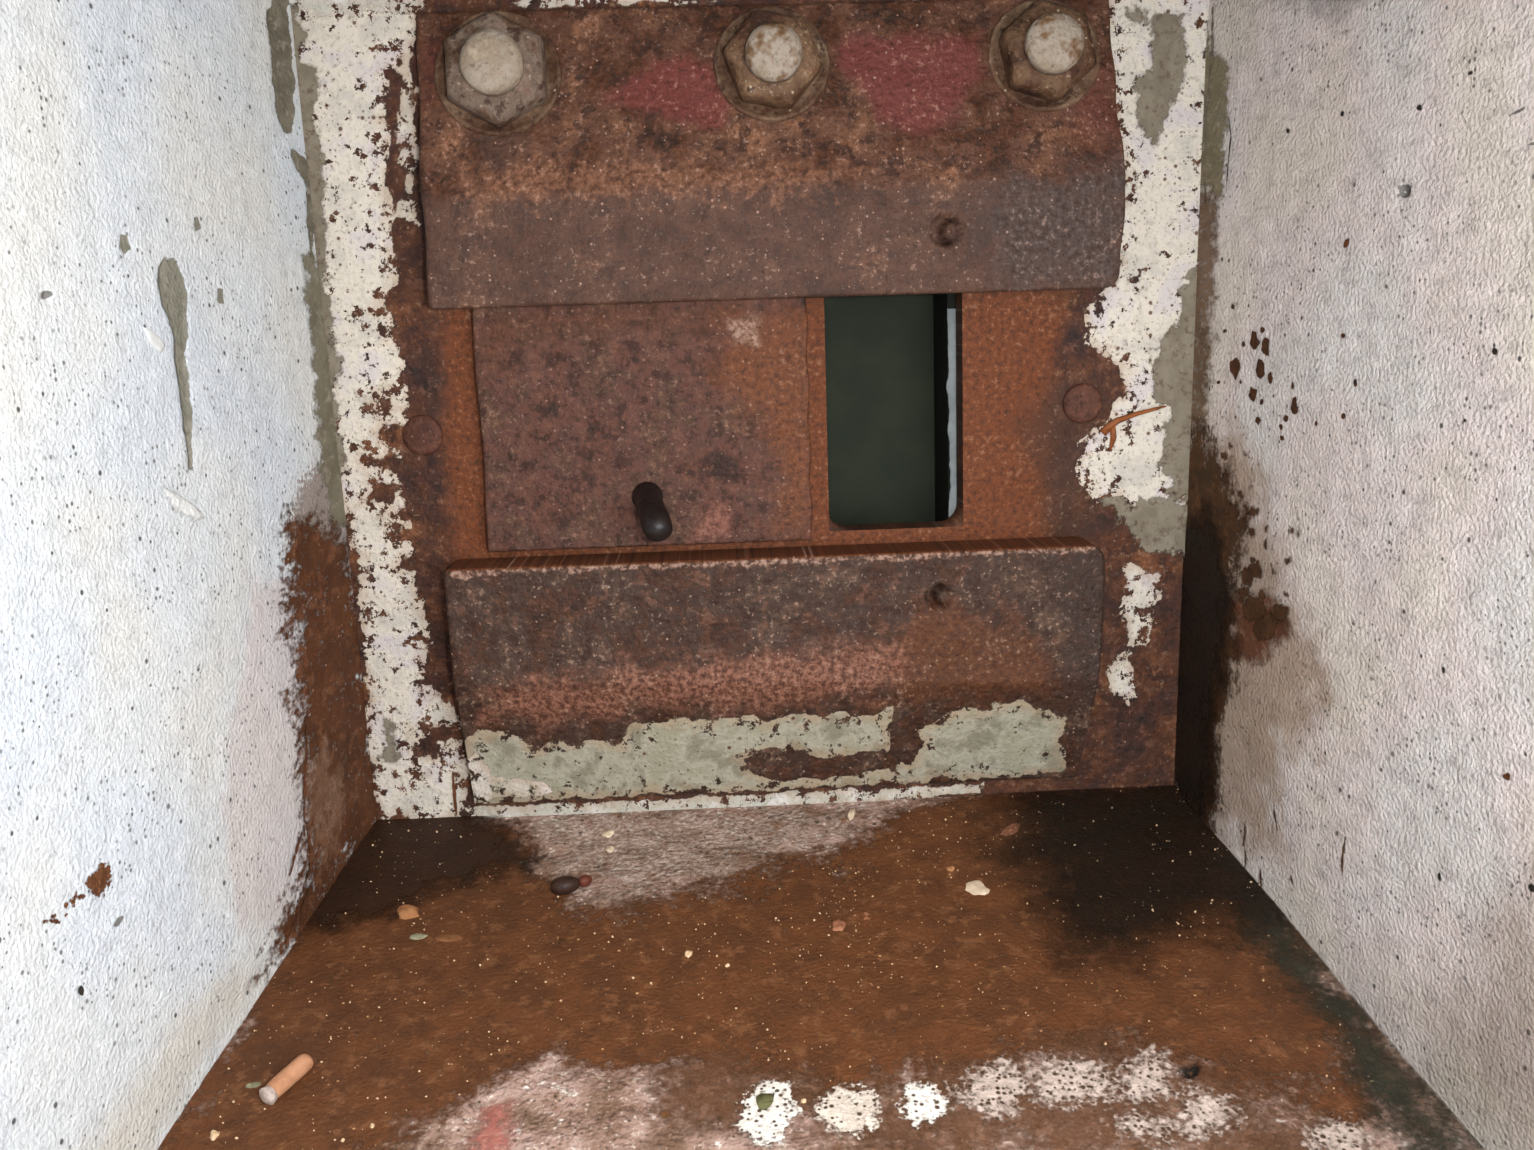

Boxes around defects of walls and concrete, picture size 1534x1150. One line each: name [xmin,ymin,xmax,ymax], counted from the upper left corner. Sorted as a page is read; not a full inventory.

peeling [291,0,1068,853]
peeling [1075,0,1209,507]
corrosion [1216,327,1273,425]
corrosion [1279,382,1298,441]
peeling [1106,562,1162,706]
corrosion [1174,418,1291,833]
corrosion [43,859,112,924]
corrosion [157,504,1384,1150]
leakage [735,1044,1248,1150]
leakage [1003,785,1483,1150]